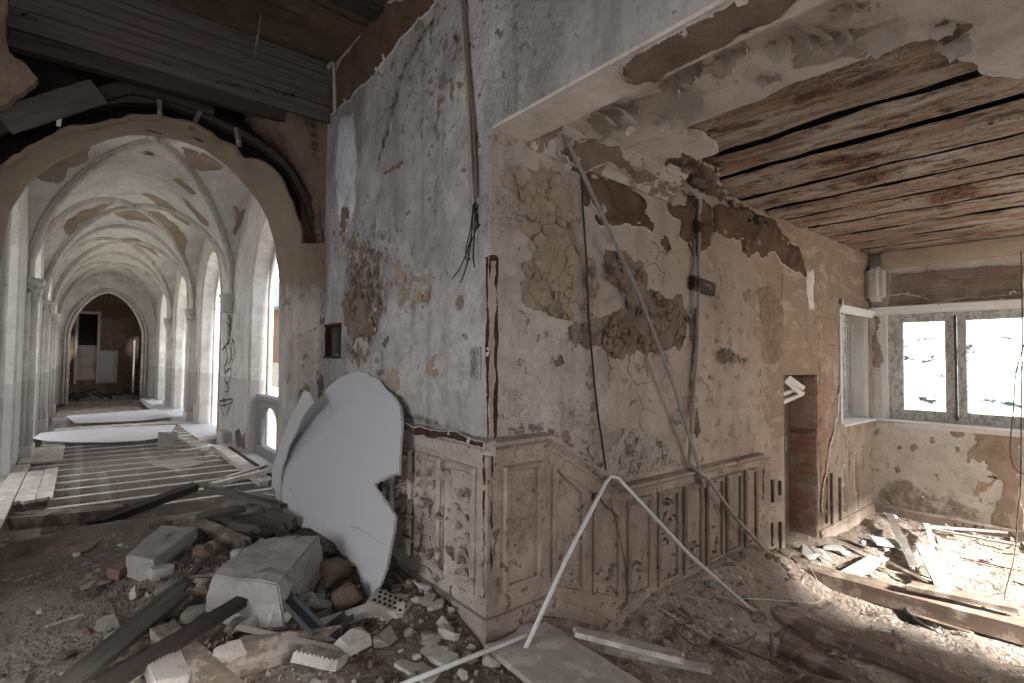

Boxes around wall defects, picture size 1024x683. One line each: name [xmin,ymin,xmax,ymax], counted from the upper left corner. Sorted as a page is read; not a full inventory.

peeling [928,18,975,64]
spalling [36,146,92,185]
spalling [180,146,224,172]
spalling [63,177,210,254]
spalling [232,206,245,236]
peeling [501,0,906,530]
peeling [341,287,390,368]
crack [607,352,677,432]
spalling [949,431,1024,531]
peeling [632,497,678,589]